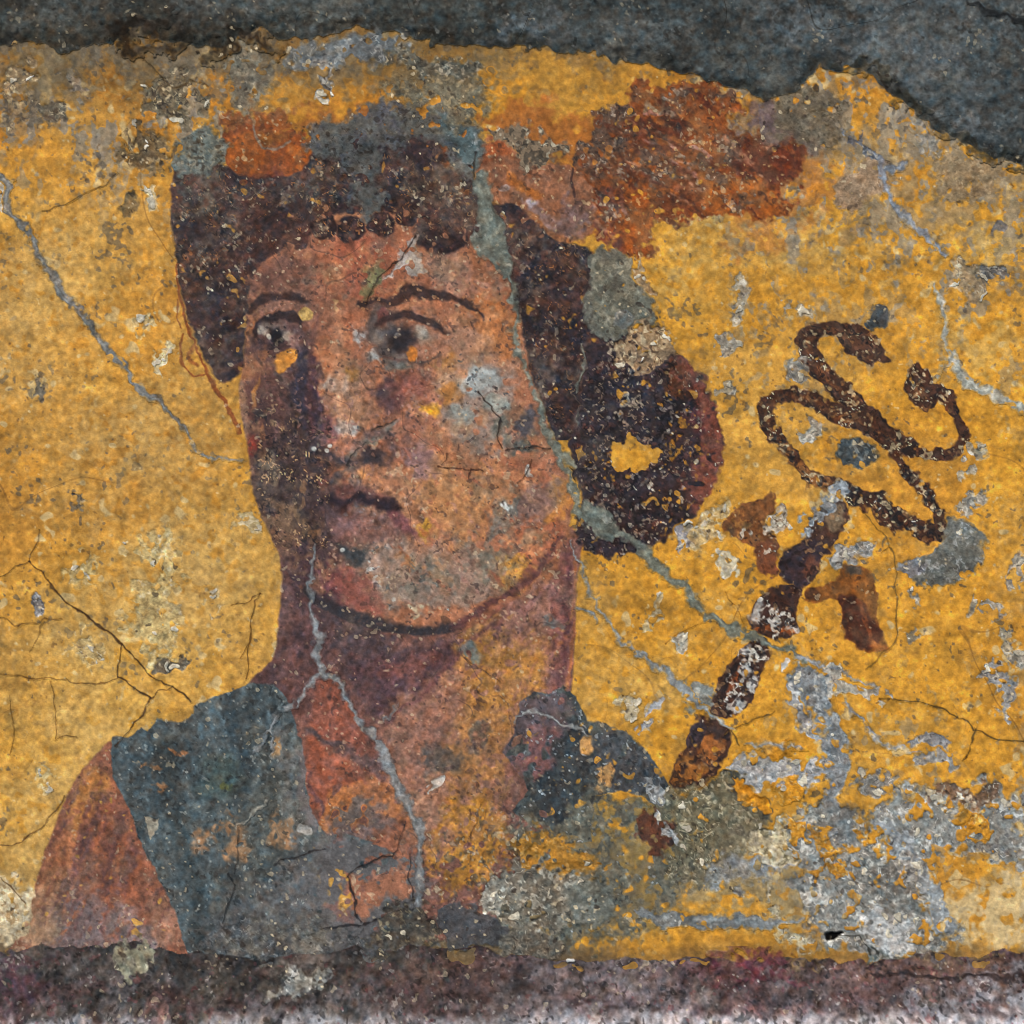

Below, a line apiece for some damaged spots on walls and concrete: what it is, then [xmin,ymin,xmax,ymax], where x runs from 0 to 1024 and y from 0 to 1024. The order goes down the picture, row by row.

spalling [112,38,276,219]
spalling [313,61,335,105]
crack [0,172,244,463]
crack [469,148,1024,778]
crack [0,795,66,847]
crack [0,529,192,756]
crack [231,592,262,680]
crack [252,543,428,930]
spalling [479,820,612,960]
spalling [611,678,718,736]
spalling [639,657,1024,965]
spalling [894,557,928,610]